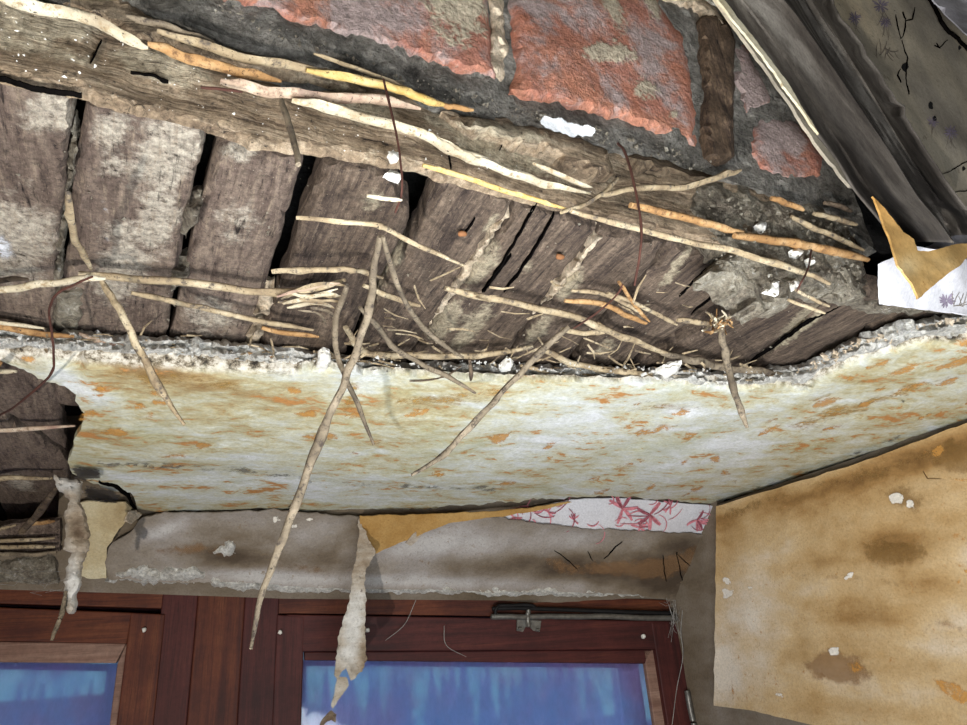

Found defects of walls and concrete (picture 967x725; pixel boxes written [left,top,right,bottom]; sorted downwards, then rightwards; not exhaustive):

crack [894,0,967,94]
flaking render [383,150,401,184]
peeling [663,0,967,300]
spalling [0,314,967,385]
peeling [320,518,375,725]